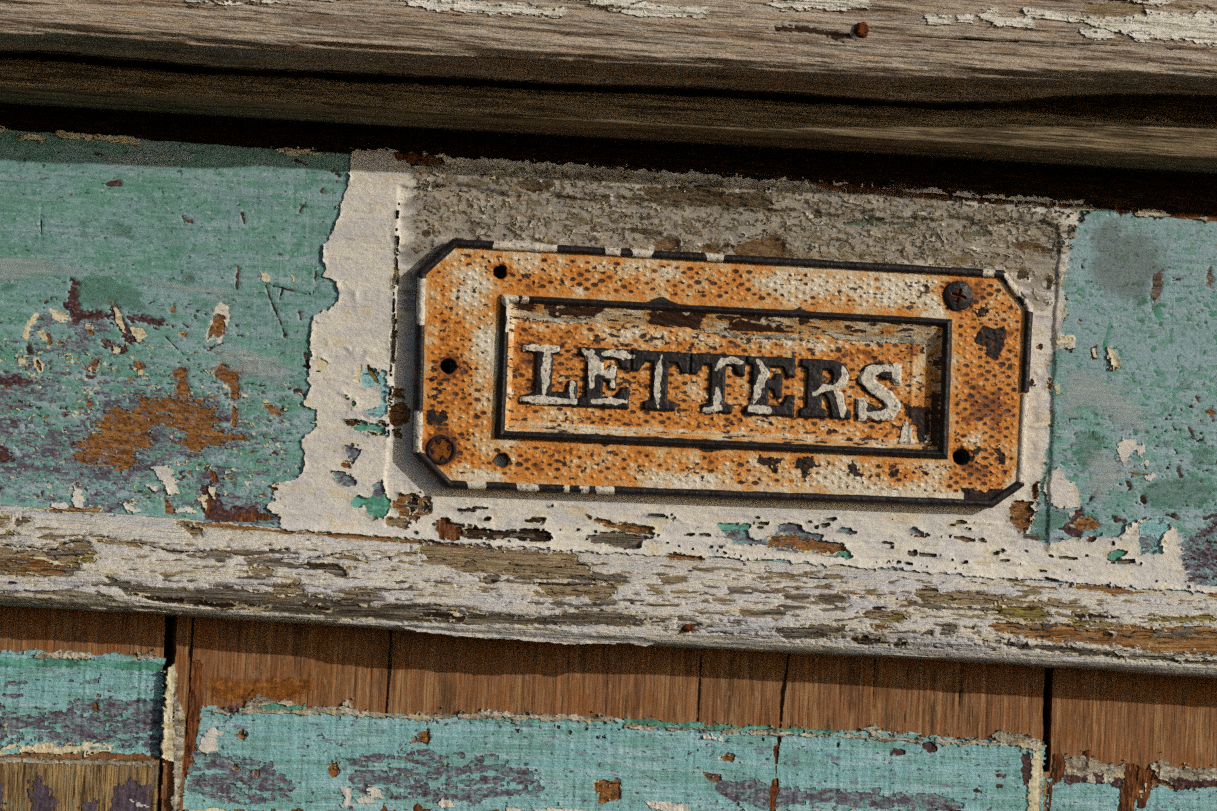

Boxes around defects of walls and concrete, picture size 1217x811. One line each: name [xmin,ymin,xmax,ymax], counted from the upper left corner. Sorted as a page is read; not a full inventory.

peeling [924,0,1217,46]
peeling [0,126,141,157]
peeling [270,146,330,166]
peeling [0,150,1217,667]
rust [431,439,452,461]
crack [0,508,1217,751]
peeling [0,648,1217,811]